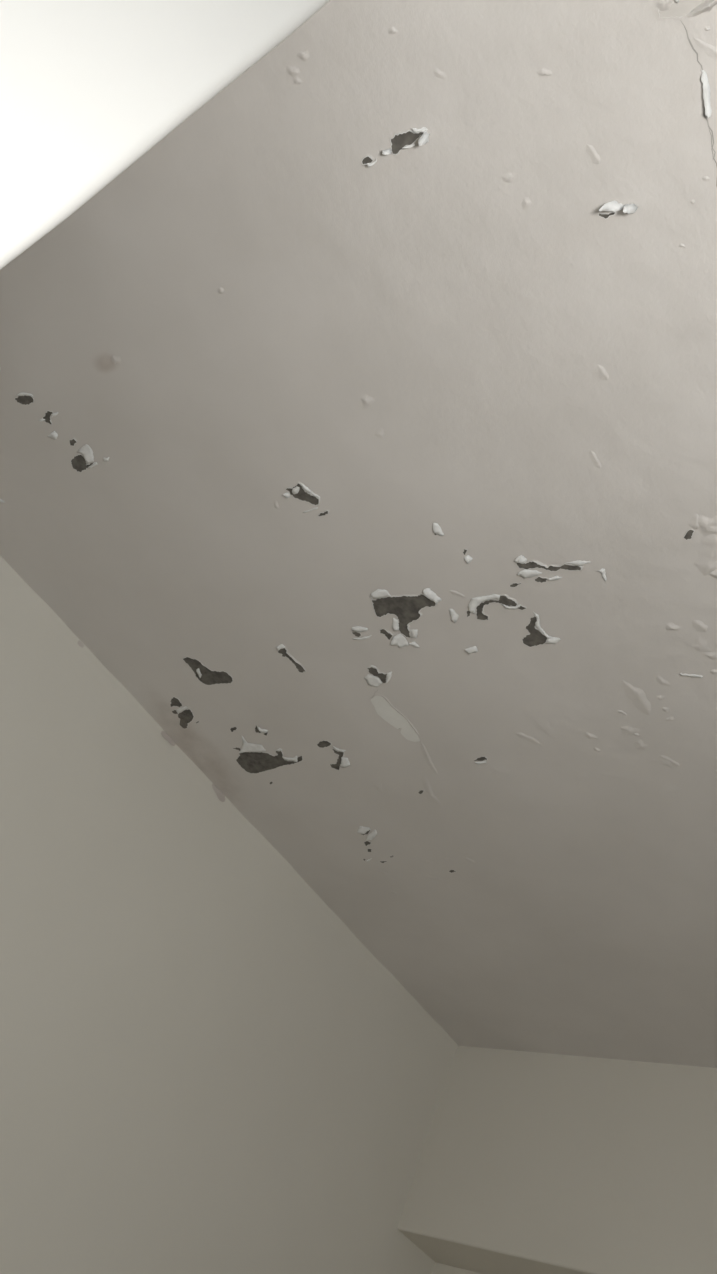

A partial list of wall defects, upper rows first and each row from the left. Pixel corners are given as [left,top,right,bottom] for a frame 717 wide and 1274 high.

peeling [653,0,717,22]
crack [680,20,717,186]
peeling [361,126,430,167]
peeling [597,201,638,220]
peeling [14,392,110,473]
peeling [273,481,330,517]
peeling [351,555,607,648]
peeling [182,656,234,685]
peeling [276,644,307,673]
peeling [230,724,304,785]
peeling [316,740,350,771]